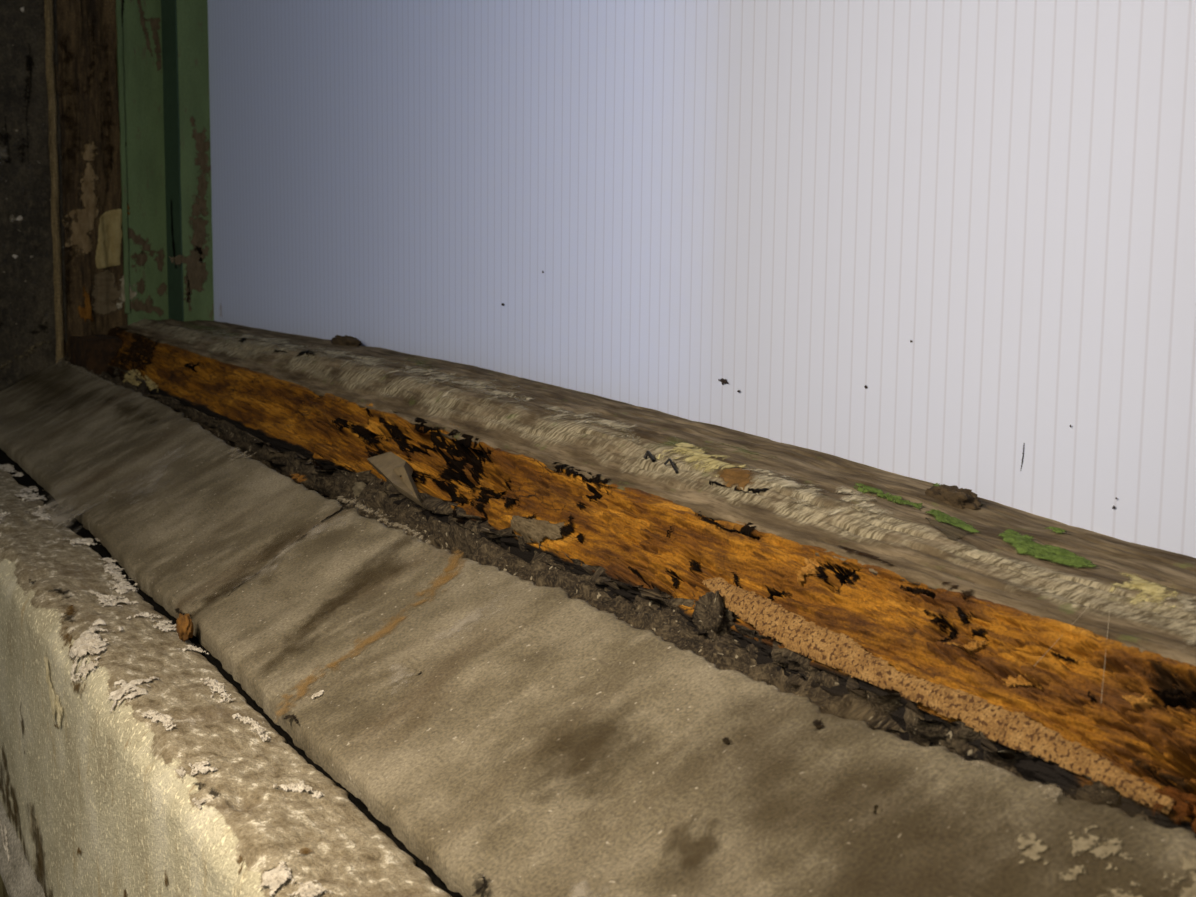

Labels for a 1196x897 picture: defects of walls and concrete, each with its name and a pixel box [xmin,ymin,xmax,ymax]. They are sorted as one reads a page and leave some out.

peeling [95,116,212,317]
spalling [332,408,609,544]
spalling [694,511,760,540]
spalling [628,560,701,599]
spalling [814,562,860,592]
spalling [900,585,989,642]
spalling [108,676,159,713]
spalling [142,710,176,731]
spalling [200,677,271,742]
spalling [174,761,221,809]
spalling [273,780,325,799]
damp [0,747,53,897]